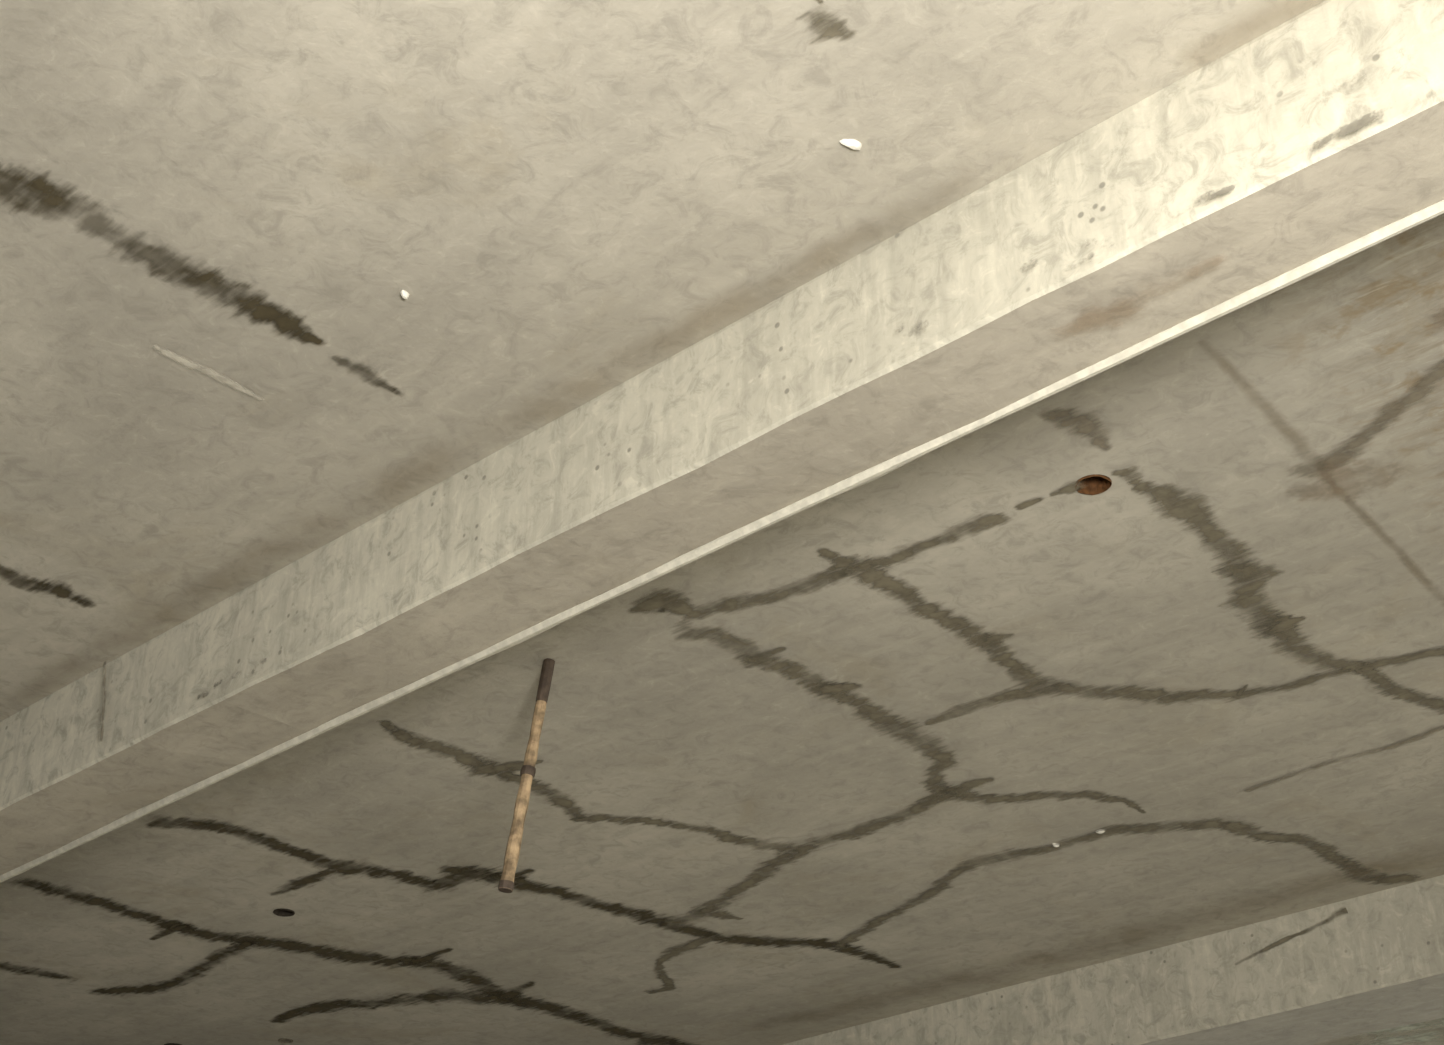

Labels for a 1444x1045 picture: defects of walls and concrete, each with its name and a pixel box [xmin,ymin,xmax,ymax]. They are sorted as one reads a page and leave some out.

crack [812,0,854,39]
crack [0,170,75,212]
crack [126,241,400,394]
crack [0,567,92,607]
crack [148,468,1444,994]
rust [520,765,536,778]
crack [0,880,690,1045]